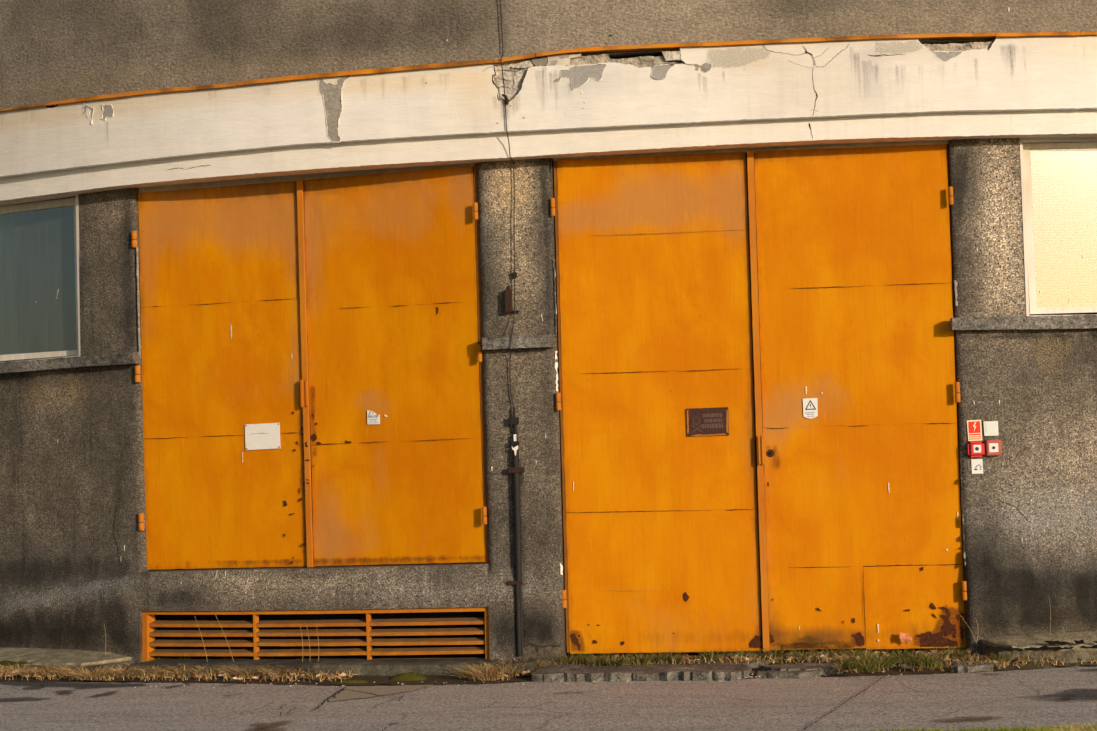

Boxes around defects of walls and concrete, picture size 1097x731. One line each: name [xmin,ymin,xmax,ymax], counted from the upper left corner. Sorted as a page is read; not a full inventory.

flaking render [870,40,994,62]
peeling [82,103,114,125]
peeling [317,75,352,143]
spalling [492,48,767,102]
crack [763,44,849,139]
rust [265,388,351,564]
rust [571,624,600,651]
rust [749,632,775,648]
rust [843,618,865,646]
rust [915,603,965,647]